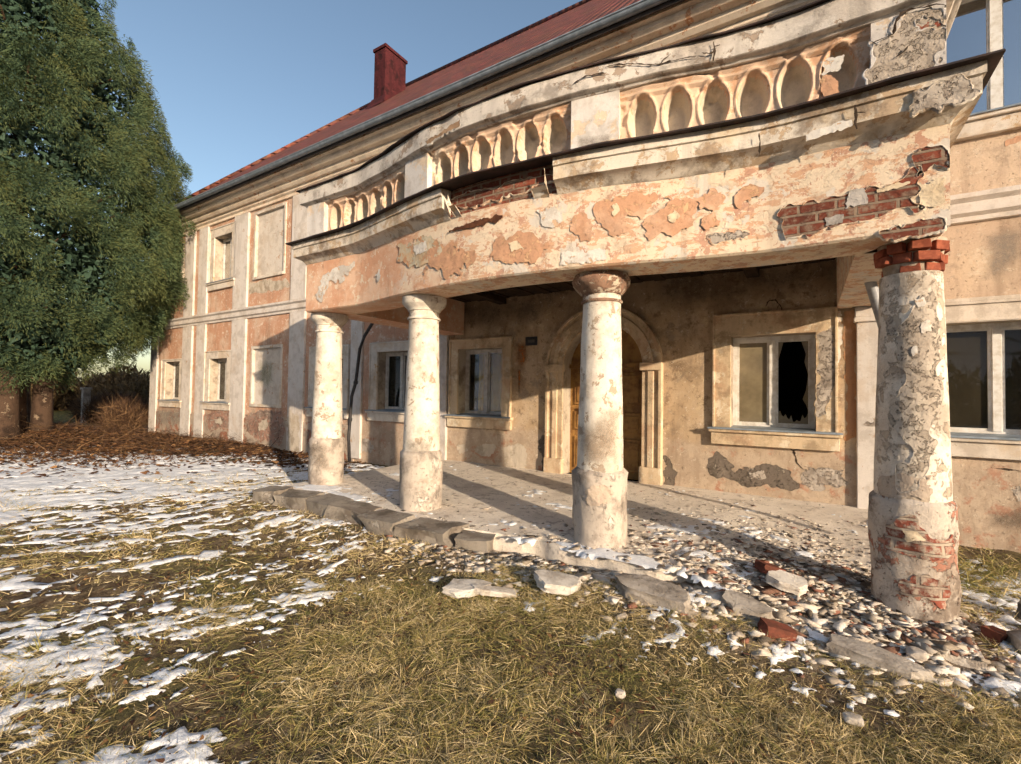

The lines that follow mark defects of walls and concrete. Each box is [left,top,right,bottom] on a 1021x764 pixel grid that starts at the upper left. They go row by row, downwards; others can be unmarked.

crack [573,41,719,84]
flaking render [862,3,946,85]
flaking render [906,74,982,118]
flaking render [450,174,554,209]
flaking render [776,144,950,243]
peeling [490,184,764,264]
peeling [397,235,476,279]
flaking render [814,310,875,441]
flaking render [877,281,945,500]
flaking render [706,451,850,492]
flaking render [885,514,954,561]
flaking render [895,574,951,609]